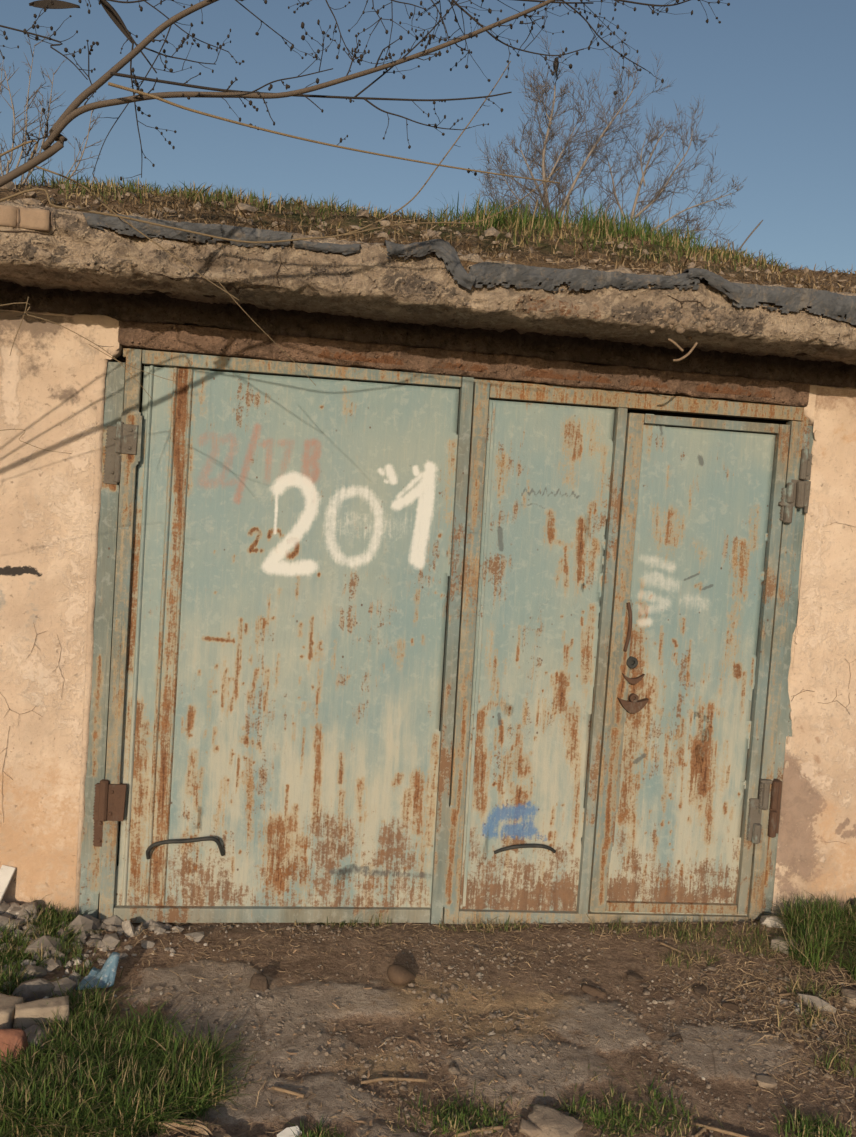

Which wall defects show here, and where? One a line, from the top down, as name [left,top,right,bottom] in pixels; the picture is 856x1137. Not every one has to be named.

rust [87,363,779,922]
crack [791,659,856,711]
damp [772,737,856,916]